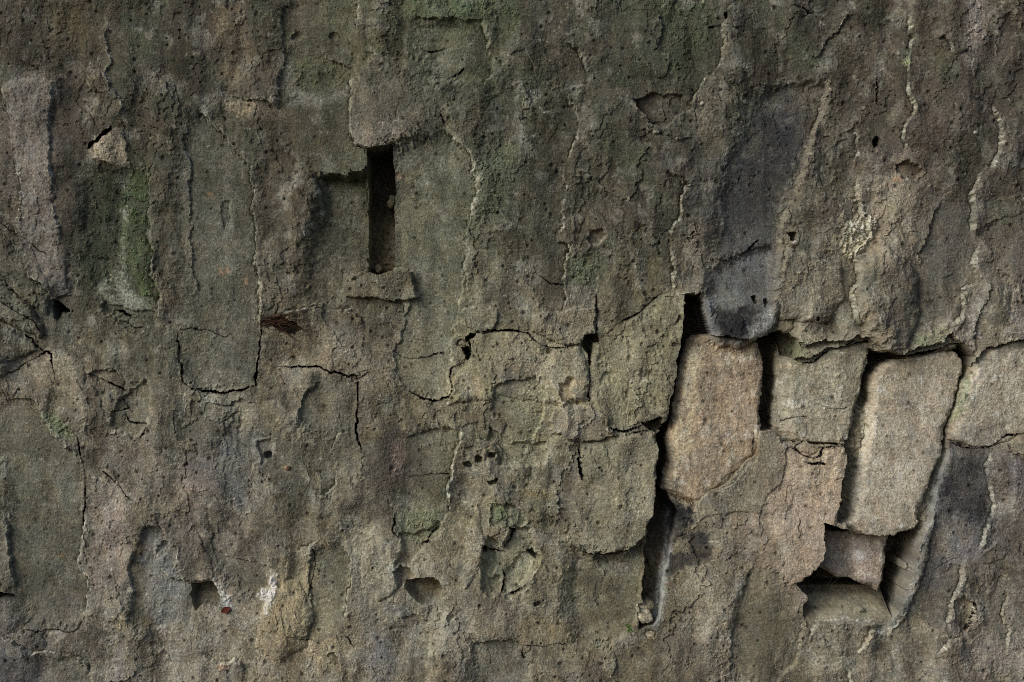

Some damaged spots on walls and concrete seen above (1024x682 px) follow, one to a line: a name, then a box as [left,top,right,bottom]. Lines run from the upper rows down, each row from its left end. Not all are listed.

damp [717,226,780,261]
crack [0,279,54,375]
crack [176,322,368,469]
crack [395,293,661,401]
crack [572,417,658,479]
peeling [121,521,212,627]